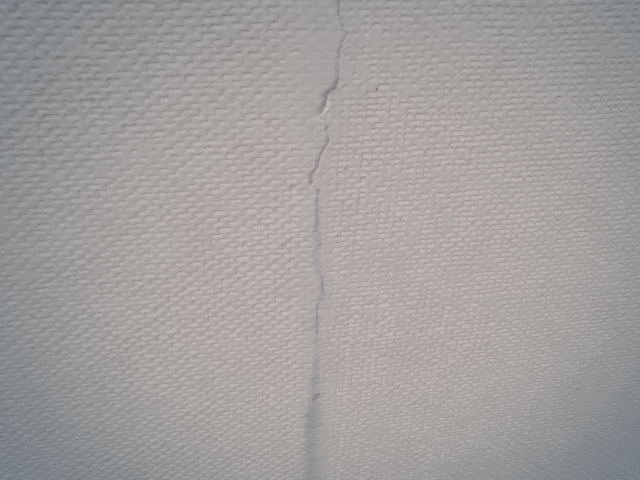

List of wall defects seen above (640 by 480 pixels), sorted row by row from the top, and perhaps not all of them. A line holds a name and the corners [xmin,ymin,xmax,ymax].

crack [318,36,346,117]
crack [311,136,329,194]